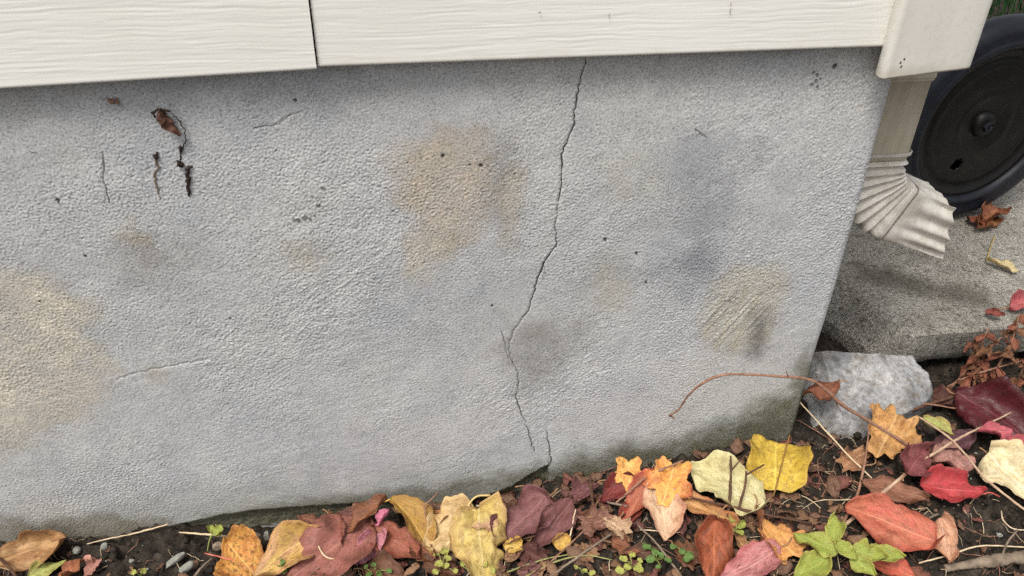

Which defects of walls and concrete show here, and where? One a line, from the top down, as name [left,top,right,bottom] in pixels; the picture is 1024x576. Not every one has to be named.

crack [501,59,586,480]